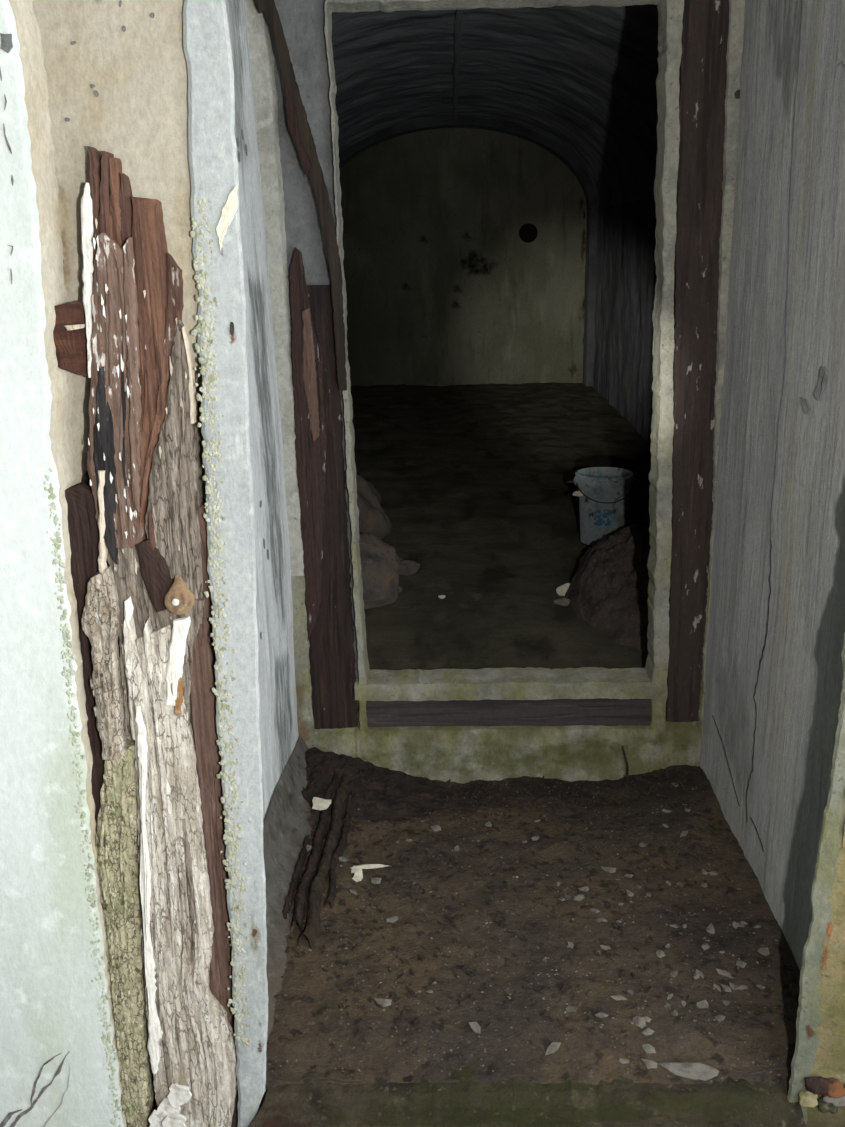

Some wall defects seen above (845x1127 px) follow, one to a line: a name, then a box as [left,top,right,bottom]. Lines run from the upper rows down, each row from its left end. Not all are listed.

peeling [216,185,238,256]
peeling [89,284,127,371]
peeling [43,455,140,1127]
crack [0,1051,71,1127]
flaking render [136,1083,192,1127]